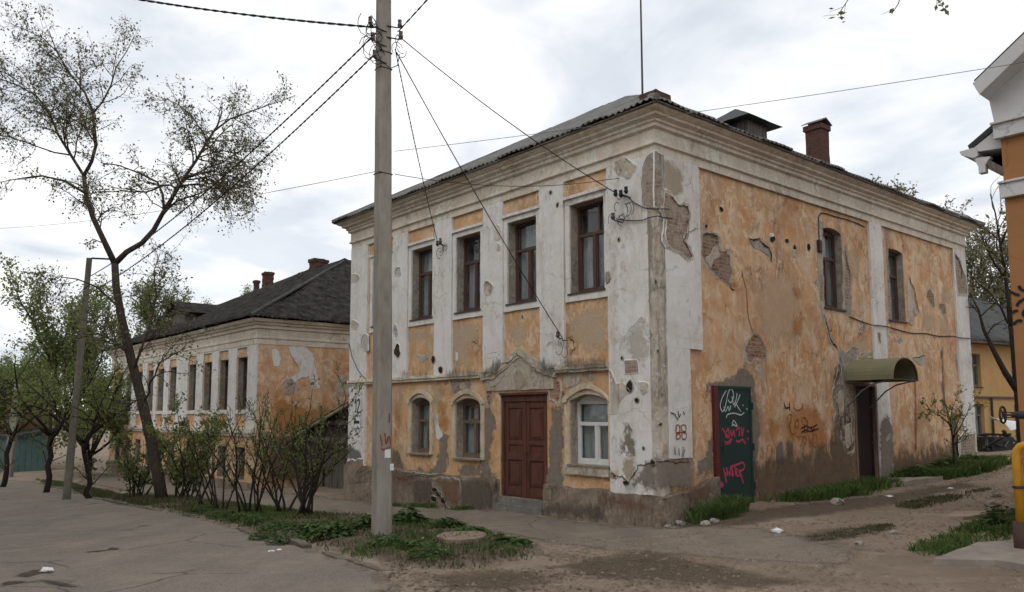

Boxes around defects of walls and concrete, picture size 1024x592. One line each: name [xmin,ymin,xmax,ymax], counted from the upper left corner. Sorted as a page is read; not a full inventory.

flaking render [613,150,734,288]
peeling [271,346,320,395]
flaking render [744,332,768,373]
spalling [748,220,873,456]
leakage [754,397,858,502]